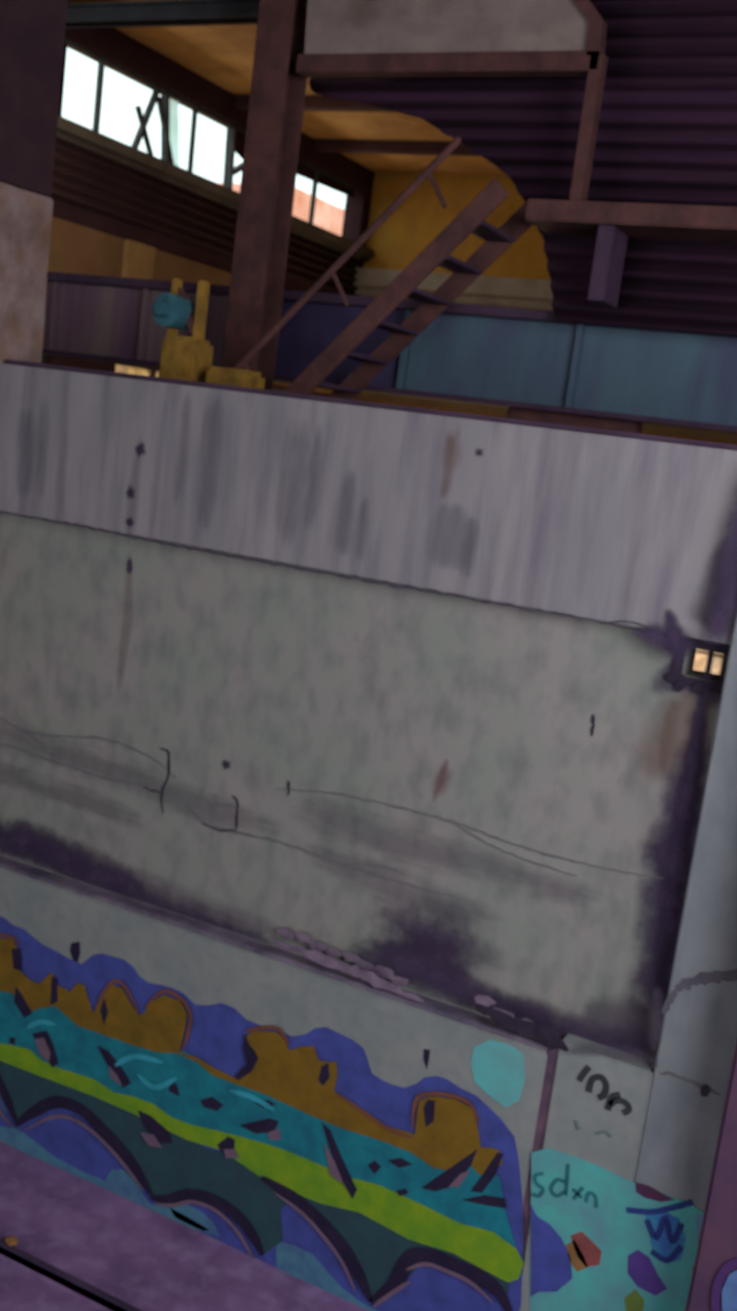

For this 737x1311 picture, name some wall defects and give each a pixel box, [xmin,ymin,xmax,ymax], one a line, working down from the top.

damp [359,946,523,1020]